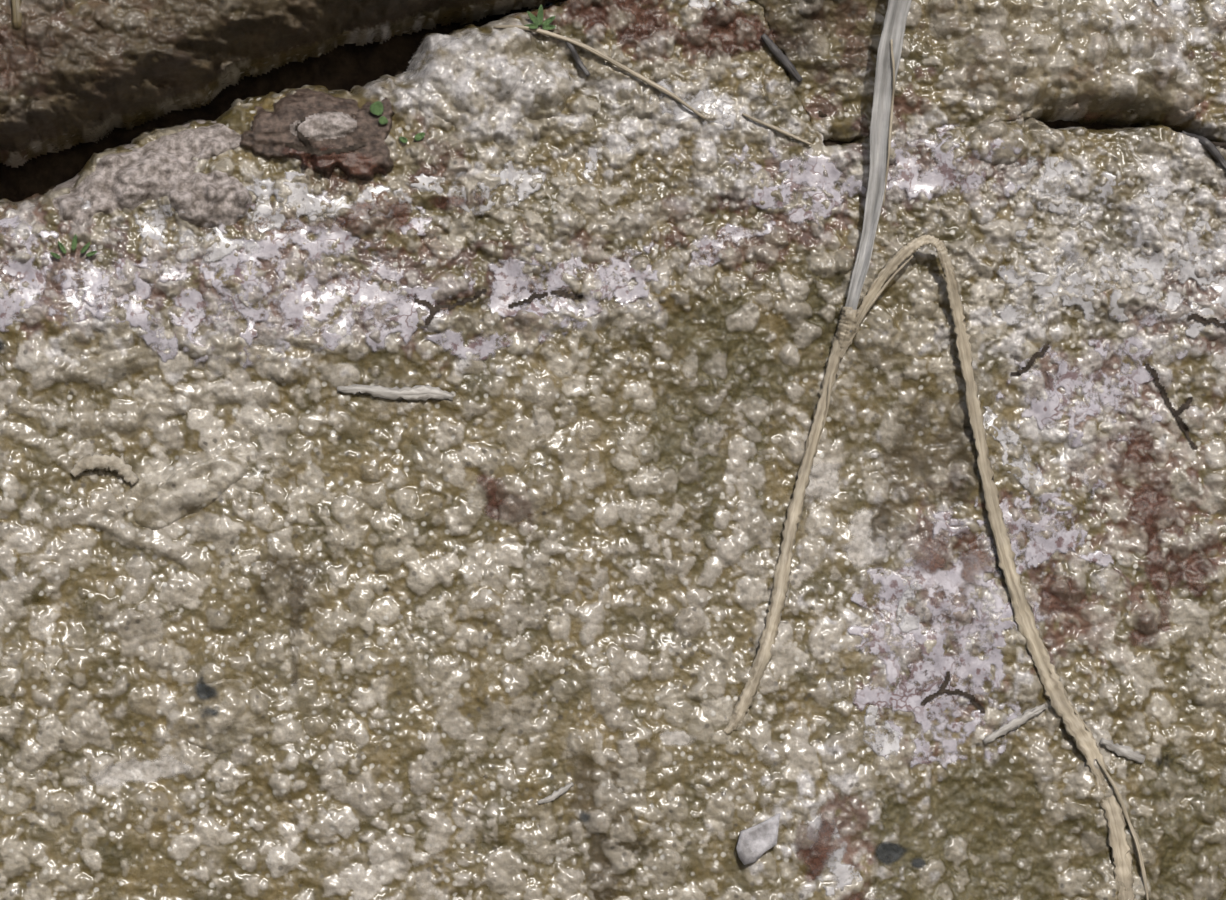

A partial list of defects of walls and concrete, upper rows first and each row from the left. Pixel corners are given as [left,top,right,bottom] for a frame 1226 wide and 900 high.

crack [0,4,550,202]
crack [1041,120,1136,130]
crack [1187,135,1226,150]